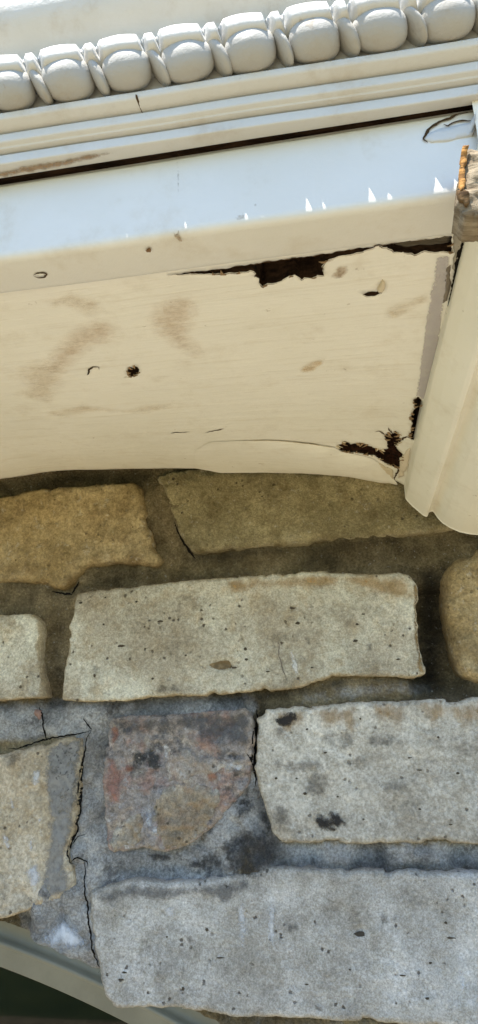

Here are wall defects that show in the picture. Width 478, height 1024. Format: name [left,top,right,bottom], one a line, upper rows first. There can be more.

peeling [423,101,476,207]
spalling [212,248,360,288]
peeling [387,235,464,303]
spalling [336,398,422,479]
crack [9,708,99,973]